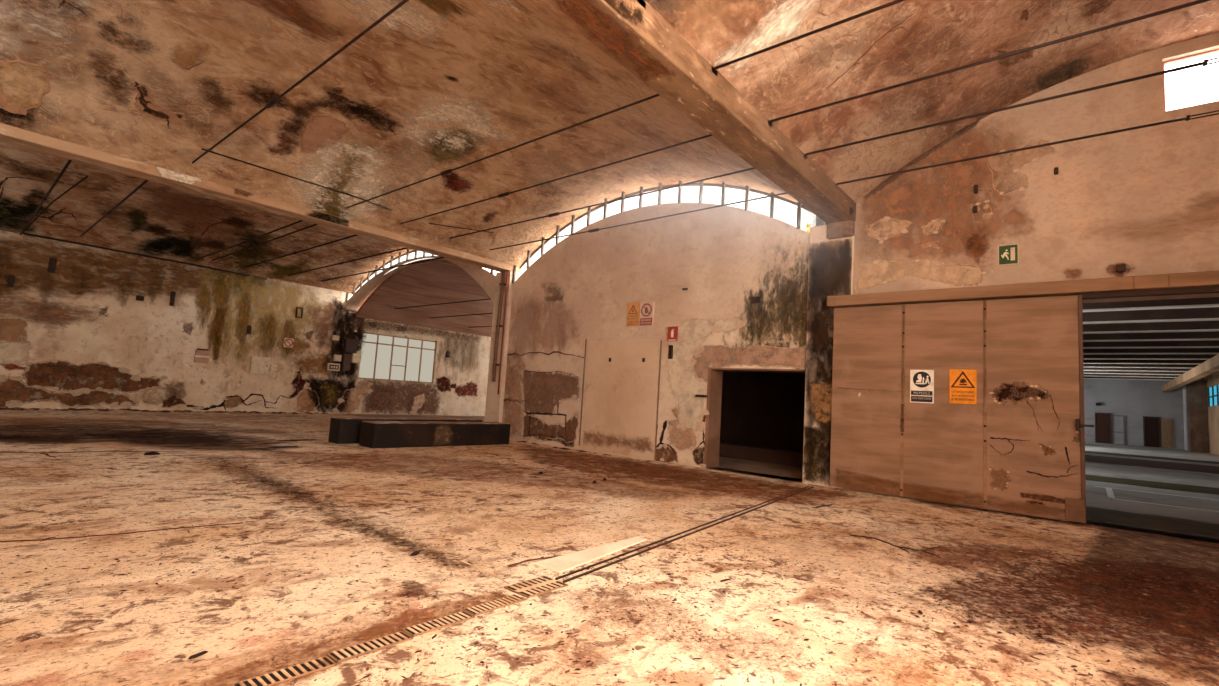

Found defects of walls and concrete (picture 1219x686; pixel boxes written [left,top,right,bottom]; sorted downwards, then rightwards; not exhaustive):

water stain [719,0,812,68]
peeling [0,60,53,115]
crack [134,82,170,129]
water stain [247,86,509,164]
water stain [863,129,1027,260]
water stain [0,159,439,414]
peeling [856,216,987,291]
flaking render [0,341,205,410]
crack [187,393,288,410]
flaking render [520,370,579,447]
water stain [745,240,852,482]
crack [990,395,1079,478]